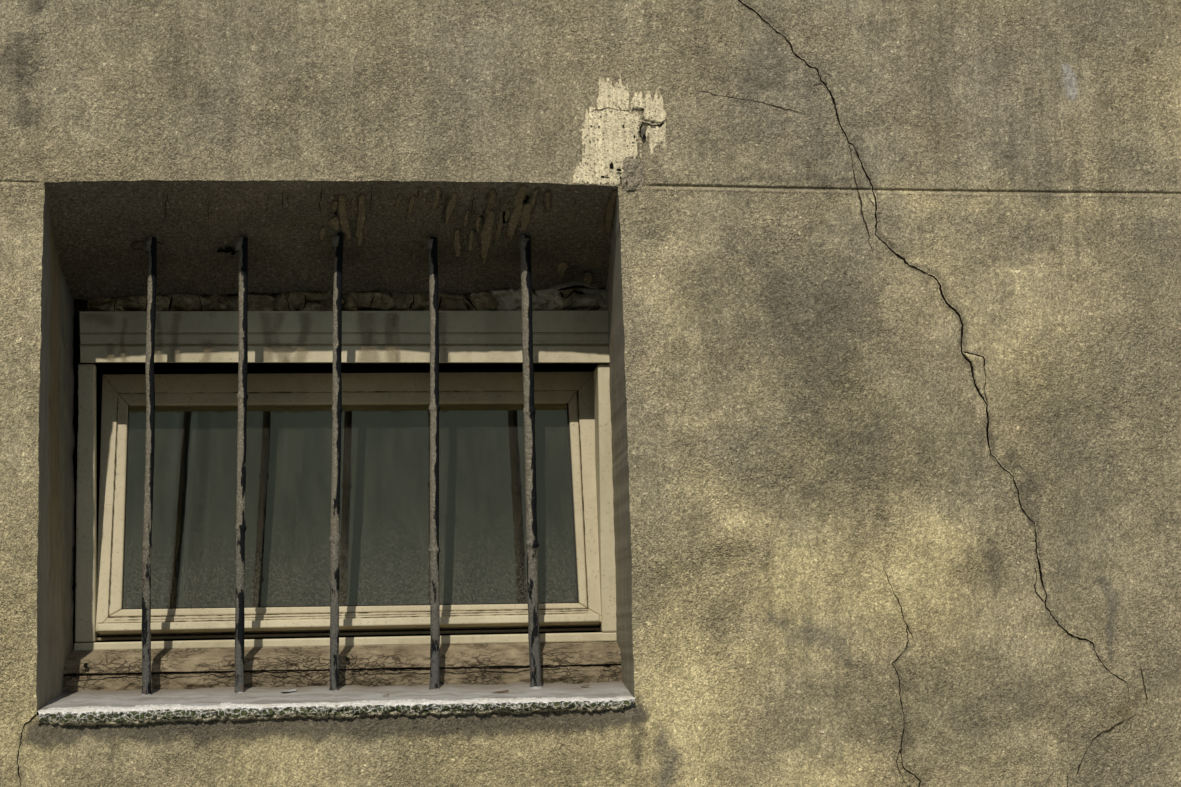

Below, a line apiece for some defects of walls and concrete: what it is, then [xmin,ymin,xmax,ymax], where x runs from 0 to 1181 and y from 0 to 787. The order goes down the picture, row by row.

spalling [572,75,667,191]
crack [701,91,800,113]
spalling [74,281,607,314]
crack [736,0,1148,787]
crack [15,713,38,787]